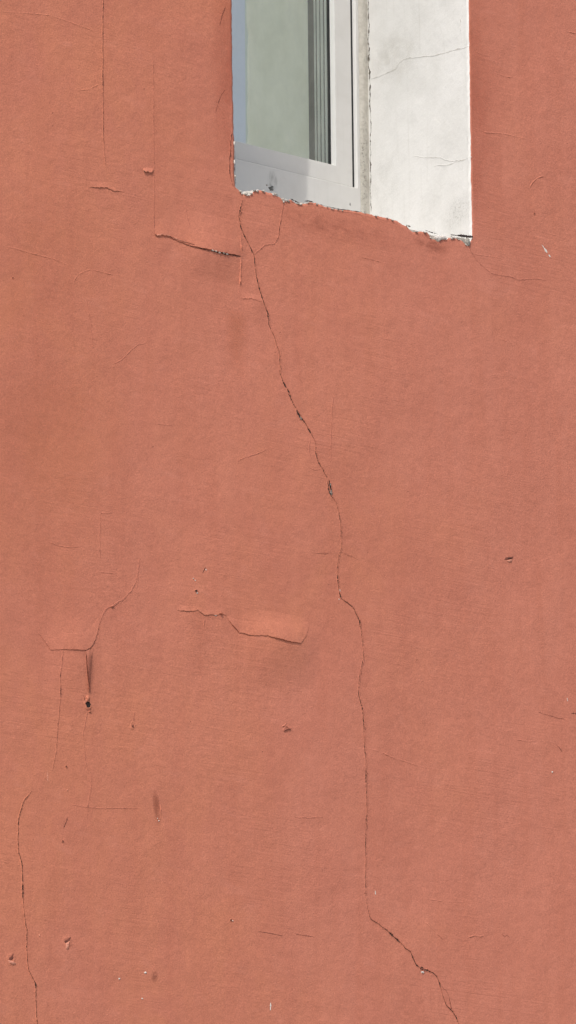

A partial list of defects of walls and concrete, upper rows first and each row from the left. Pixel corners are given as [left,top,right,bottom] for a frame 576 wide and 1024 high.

spalling [234,160,394,221]
spalling [406,225,473,246]
crack [52,559,140,770]
crack [228,128,459,1024]
crack [17,790,38,1024]